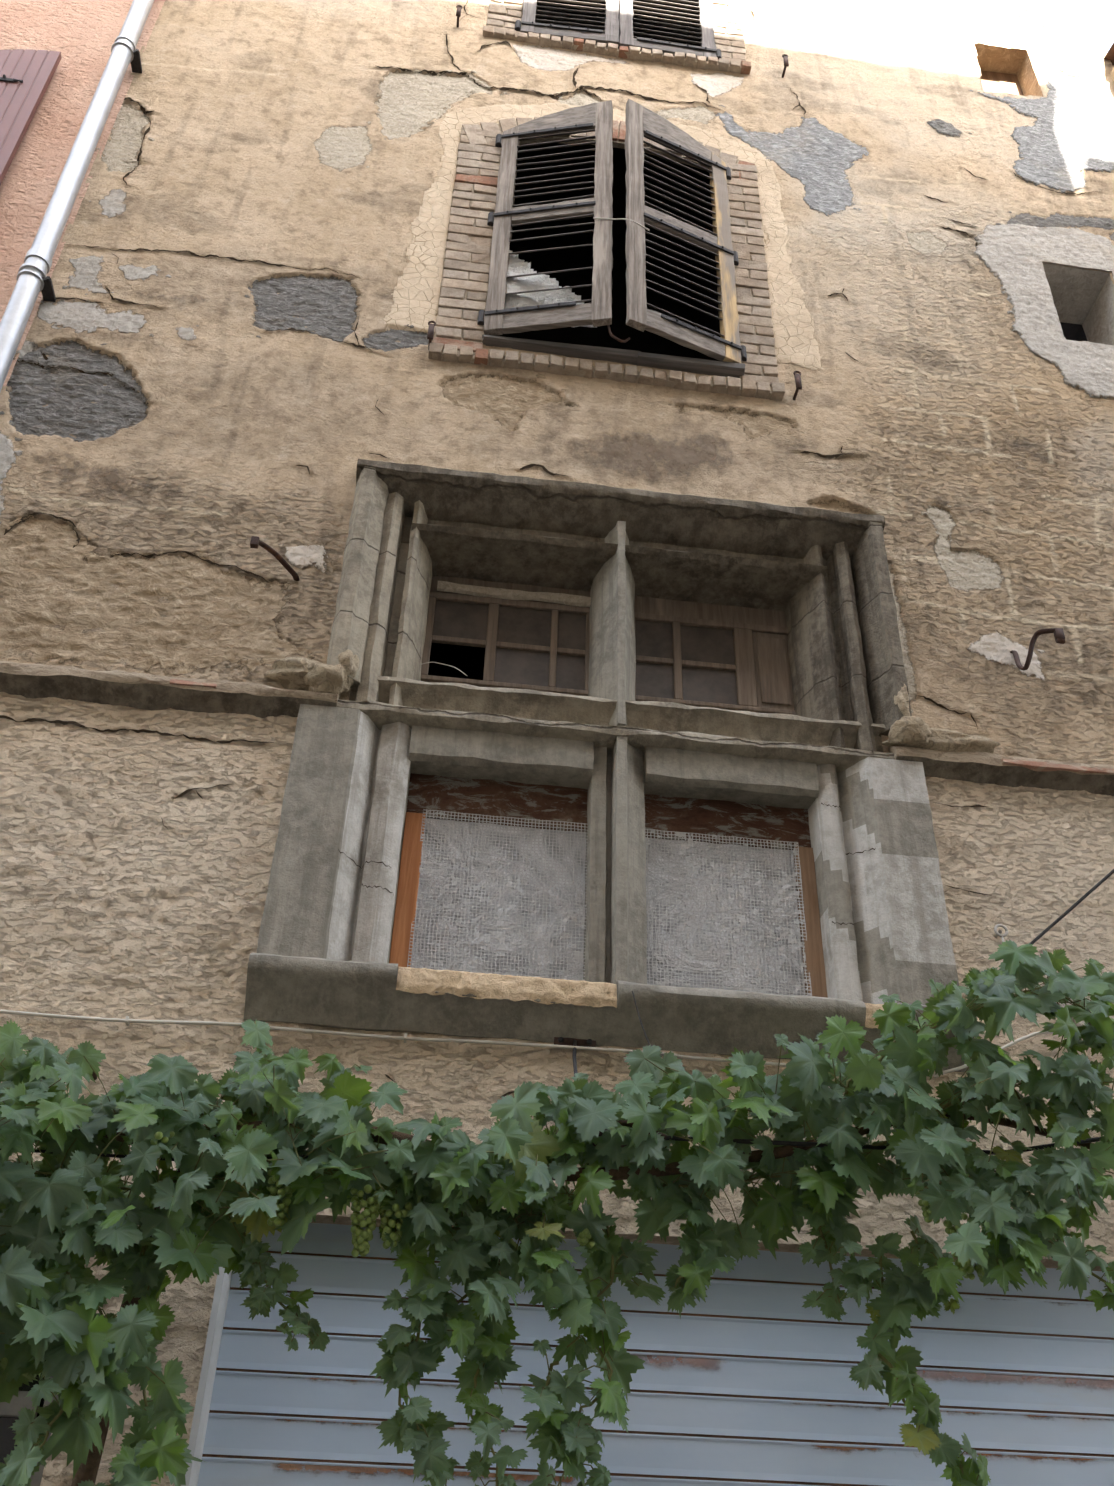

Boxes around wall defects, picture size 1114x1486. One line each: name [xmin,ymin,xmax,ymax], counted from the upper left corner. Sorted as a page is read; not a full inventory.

crack [377,0,720,110]
spalling [996,211,1114,241]
spalling [245,274,429,352]
spalling [0,340,148,456]
crack [4,512,80,548]
crack [113,550,277,585]